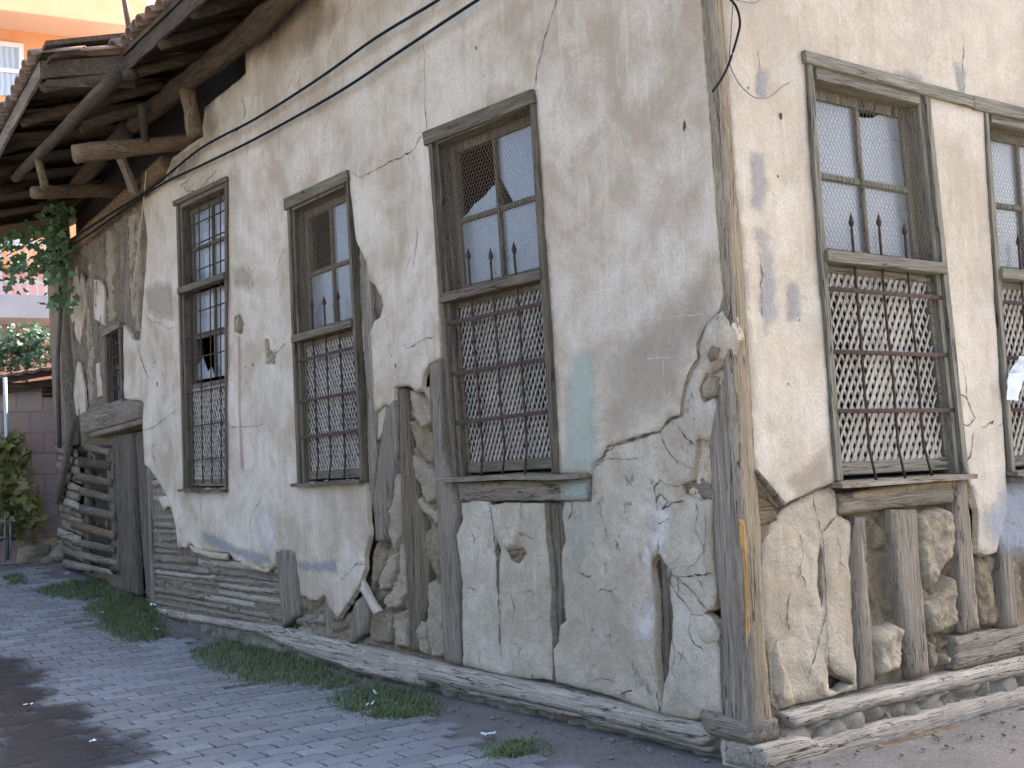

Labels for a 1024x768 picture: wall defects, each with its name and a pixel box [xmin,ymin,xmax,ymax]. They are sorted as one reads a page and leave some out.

crack [354,112,427,178]
water stain [752,155,765,206]
spalling [67,201,147,417]
spalling [153,479,282,623]
spalling [301,354,445,661]
crack [555,309,723,714]
spalling [840,504,1000,693]
spalling [1012,541,1024,626]